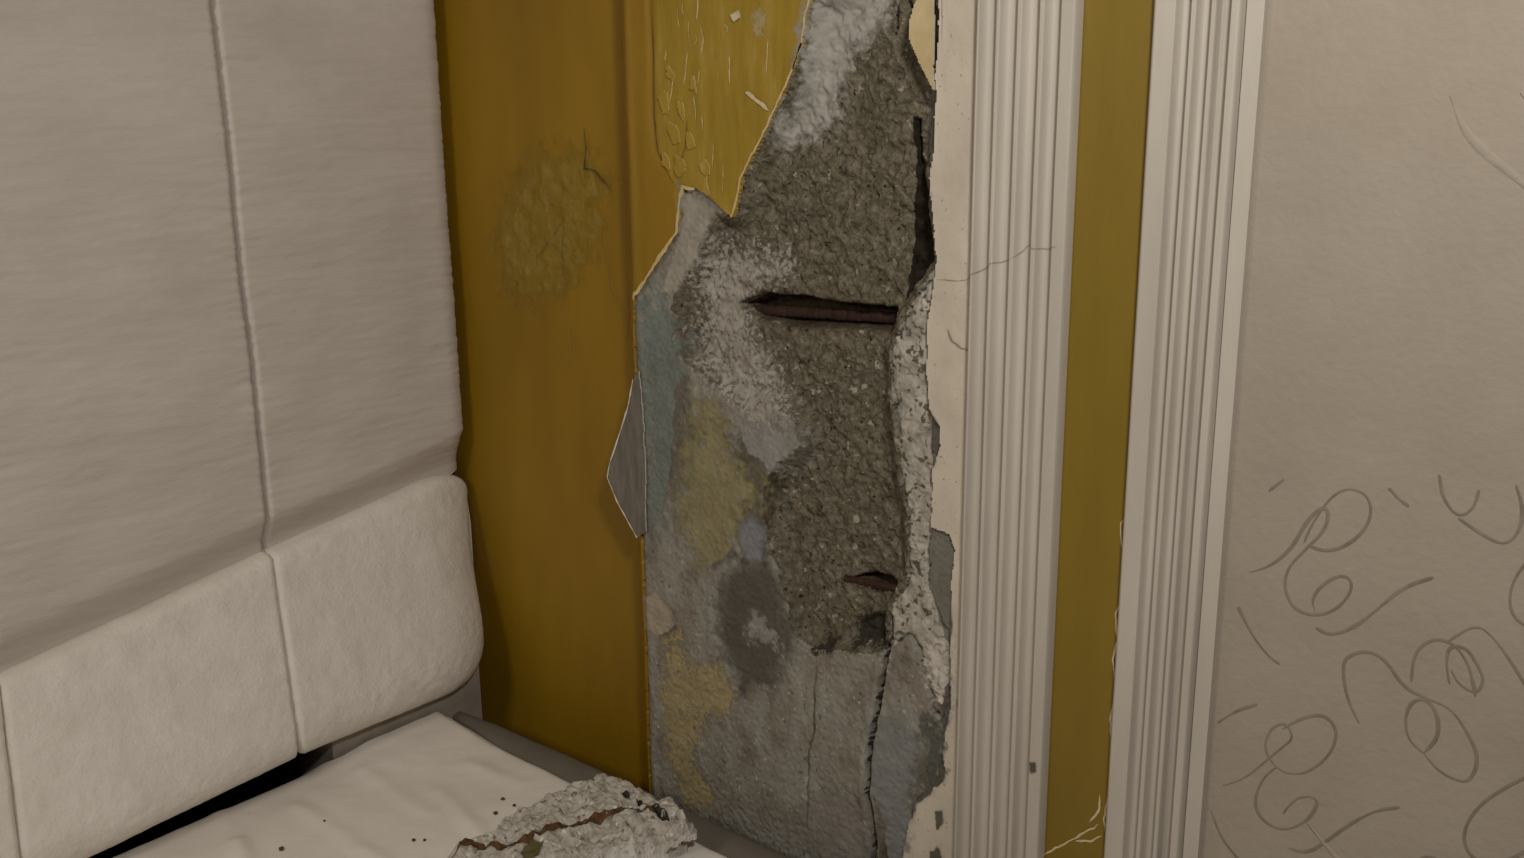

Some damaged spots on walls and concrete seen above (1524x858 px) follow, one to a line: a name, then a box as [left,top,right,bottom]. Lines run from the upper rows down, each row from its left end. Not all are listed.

spalling [607,0,957,858]
rust [742,291,899,330]
rust [858,571,898,584]
crack [806,613,894,853]